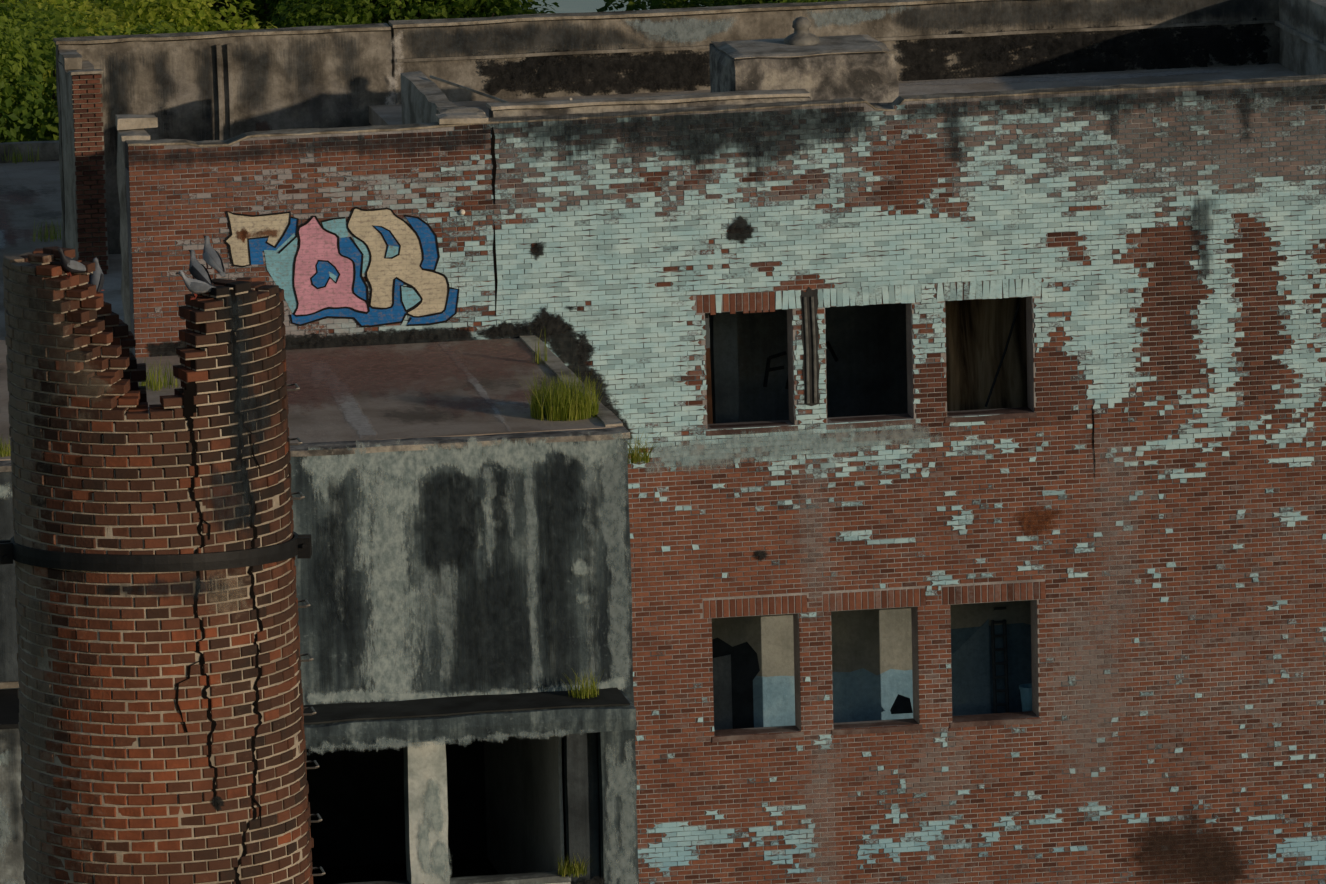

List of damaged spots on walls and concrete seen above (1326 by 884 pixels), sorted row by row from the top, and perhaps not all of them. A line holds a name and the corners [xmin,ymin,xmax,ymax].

damp [387,19,733,105]
damp [147,342,187,357]
crack [490,127,498,316]
spalling [727,216,754,244]
peeling [1134,226,1206,400]
peeling [1227,213,1292,410]
crack [176,387,217,798]
crack [230,289,263,884]
damp [285,308,632,704]
peeling [1105,419,1230,483]
peeling [638,802,818,884]
peeling [857,798,966,864]